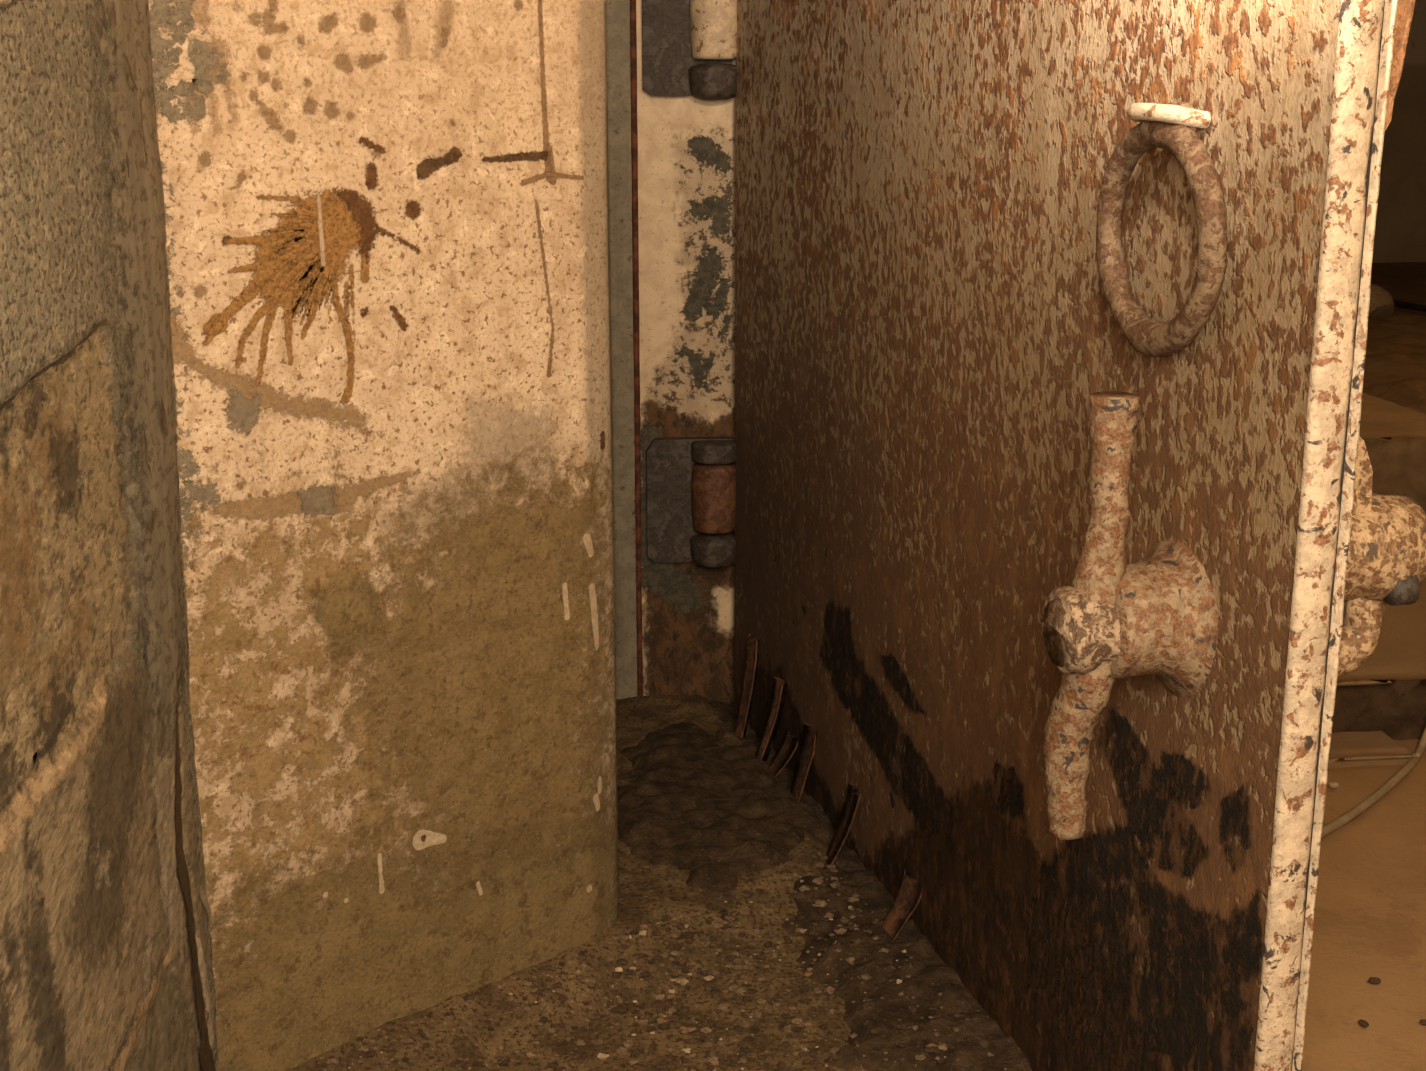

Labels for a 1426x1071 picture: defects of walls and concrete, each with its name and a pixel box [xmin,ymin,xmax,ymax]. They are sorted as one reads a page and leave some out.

crack [0,0,21,9]
water stain [186,0,337,143]
water stain [304,78,355,121]
water stain [334,54,386,73]
water stain [360,13,376,33]
corrosion [203,136,421,403]
water stain [169,311,370,436]
peeling [632,128,736,616]
water stain [142,682,186,999]
crack [175,643,216,1071]
water stain [180,447,619,1071]
water stain [0,896,70,1071]